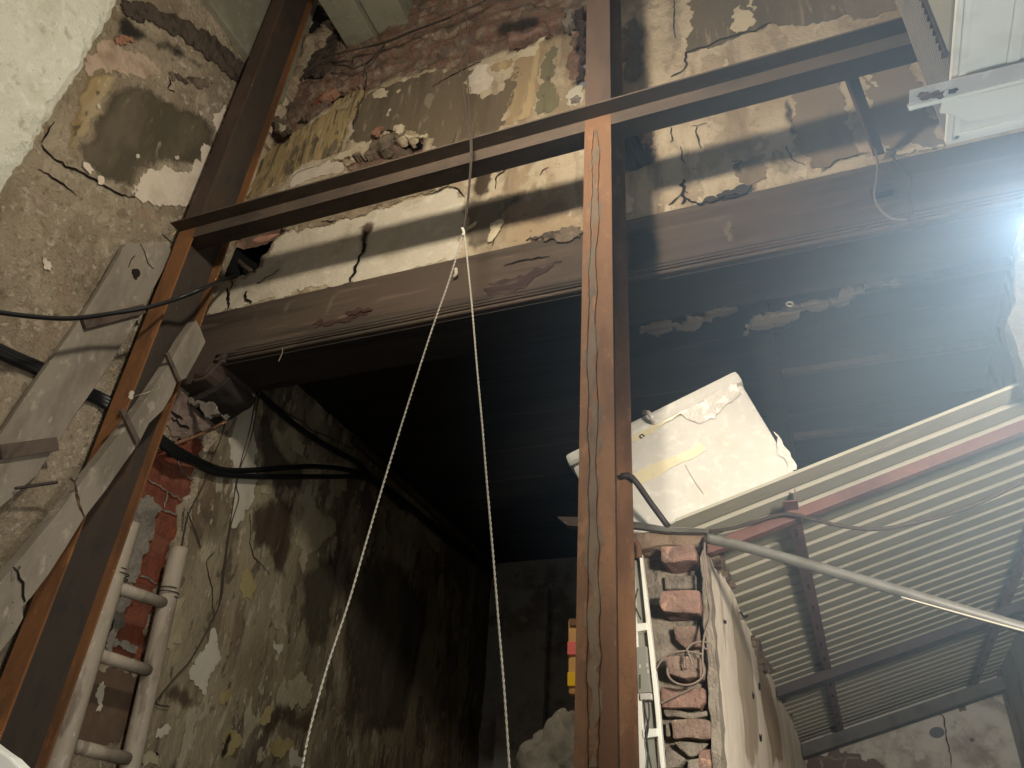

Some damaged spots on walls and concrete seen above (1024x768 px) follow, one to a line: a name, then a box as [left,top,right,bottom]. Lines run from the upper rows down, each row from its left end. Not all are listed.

crack [670,0,772,77]
spalling [272,0,587,172]
crack [39,121,135,198]
leakage [69,73,212,186]
crack [669,123,706,205]
crack [349,230,367,282]
corrosion [586,133,602,767]
flaking render [112,436,204,661]
leakage [255,500,291,571]
peeling [189,628,220,696]
leakage [302,559,426,735]
leakage [267,706,312,731]